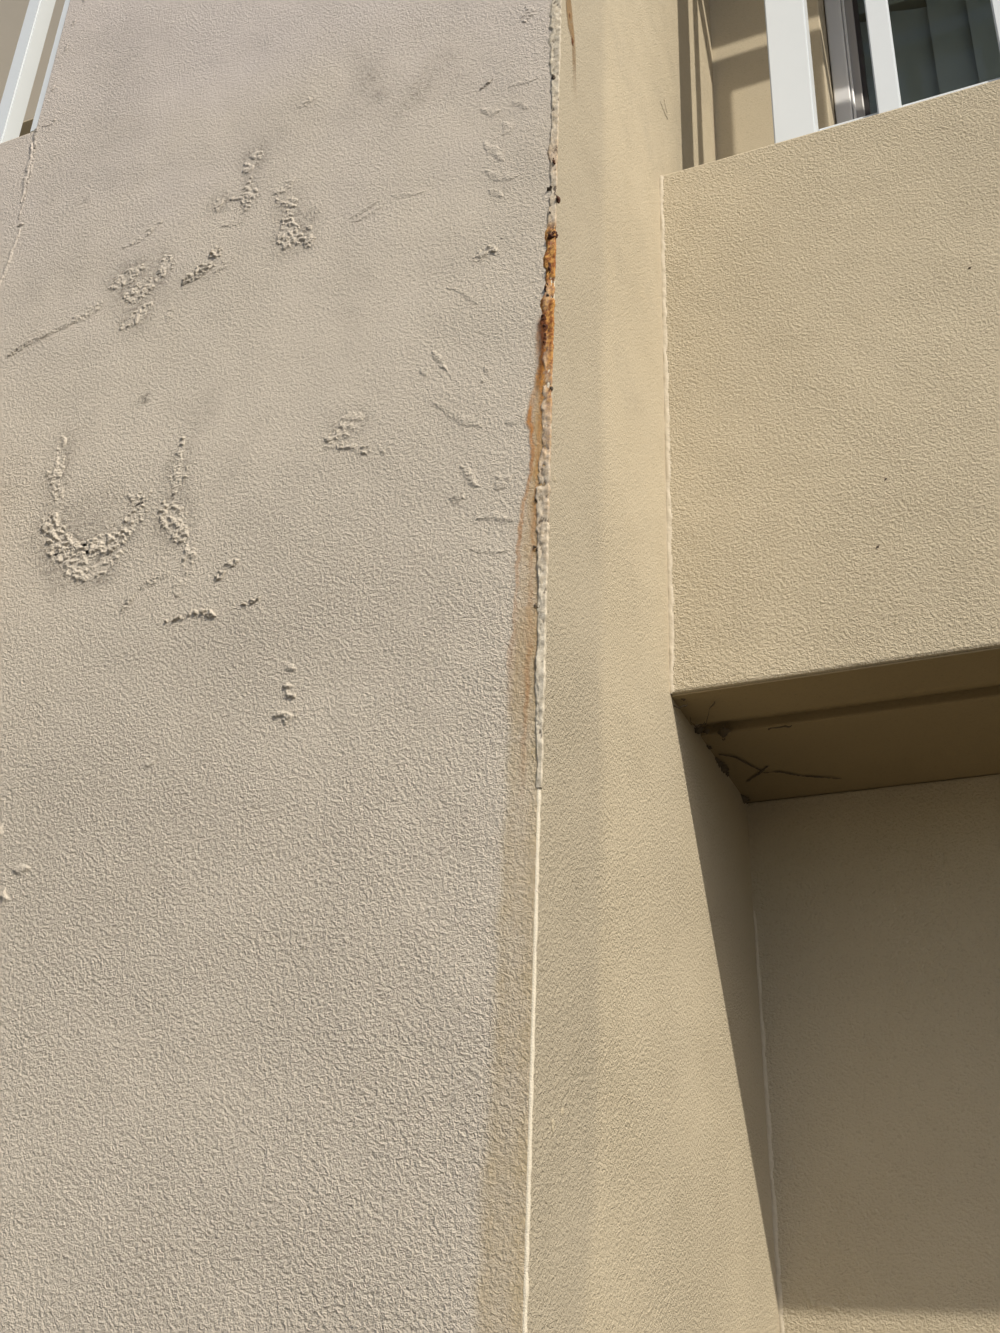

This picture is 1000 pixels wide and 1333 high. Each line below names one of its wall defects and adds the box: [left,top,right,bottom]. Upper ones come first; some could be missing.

peeling [212,150,321,251]
peeling [106,246,234,330]
rust [527,317,546,482]
peeling [39,434,197,597]
crack [719,754,840,782]